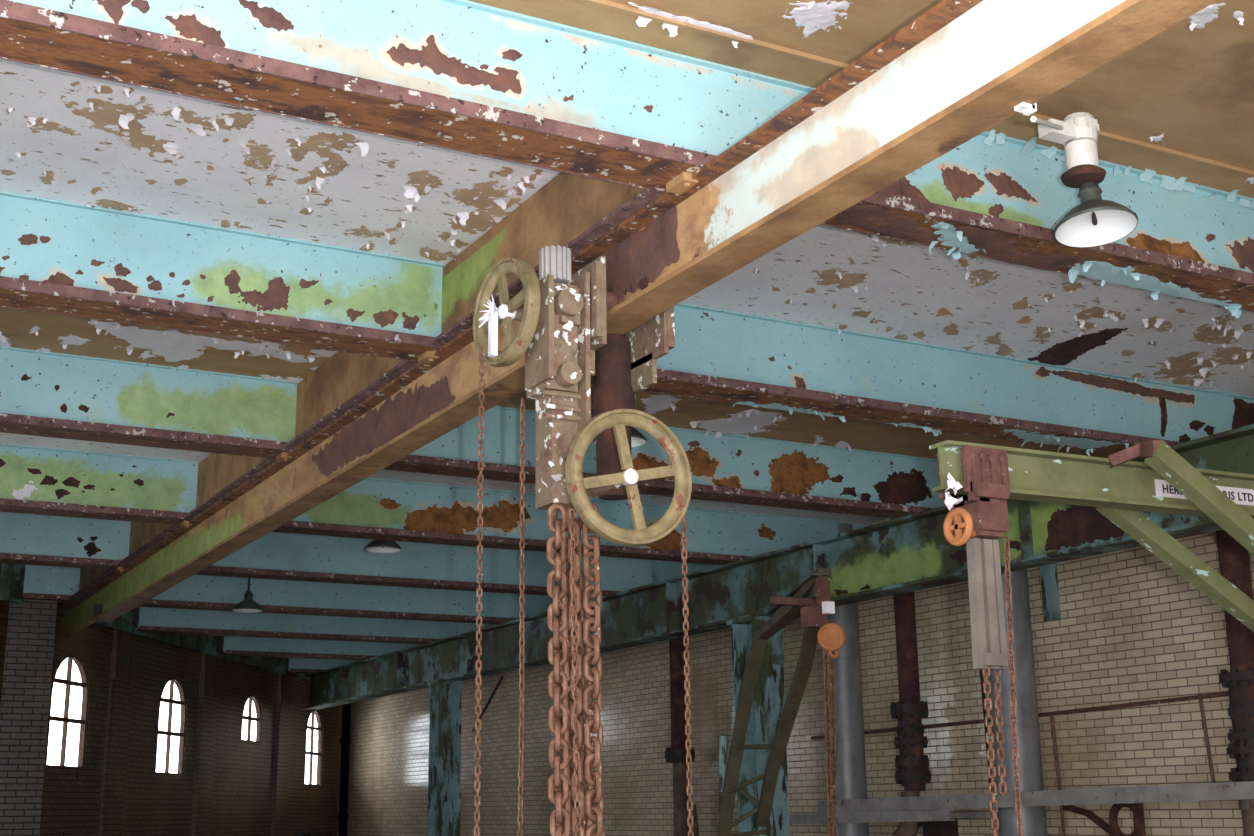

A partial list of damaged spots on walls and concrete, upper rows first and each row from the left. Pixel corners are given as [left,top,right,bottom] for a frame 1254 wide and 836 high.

corrosion [76,0,806,136]
peeling [0,81,369,215]
peeling [30,319,338,383]
damp [104,366,297,442]
damp [170,224,512,337]
peeling [340,161,543,262]
corrosion [833,156,1084,271]
peeling [1010,261,1254,390]
corrosion [1117,223,1254,273]
damp [0,446,195,513]
corrosion [681,438,933,505]
damp [62,503,248,640]